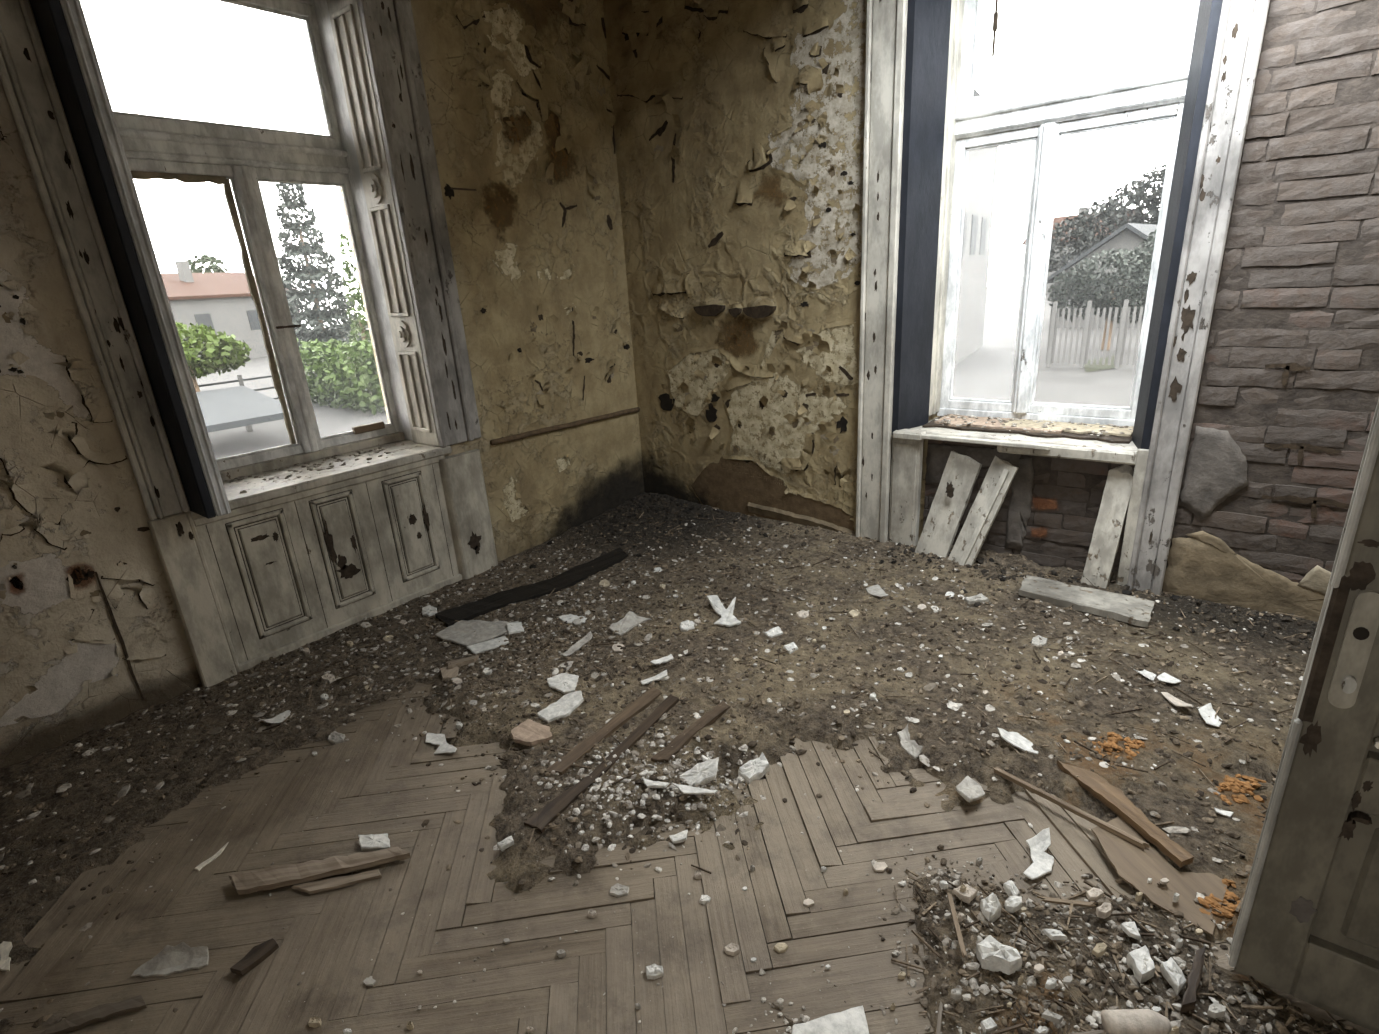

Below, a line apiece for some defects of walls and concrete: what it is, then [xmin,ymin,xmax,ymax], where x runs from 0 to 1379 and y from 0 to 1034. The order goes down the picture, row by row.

water stain [500,109,577,184]
water stain [483,181,517,241]
peeling [658,0,882,534]
peeling [0,268,113,441]
peeling [107,317,125,371]
water stain [551,457,708,538]
peeling [0,553,101,615]
peeling [0,637,124,733]